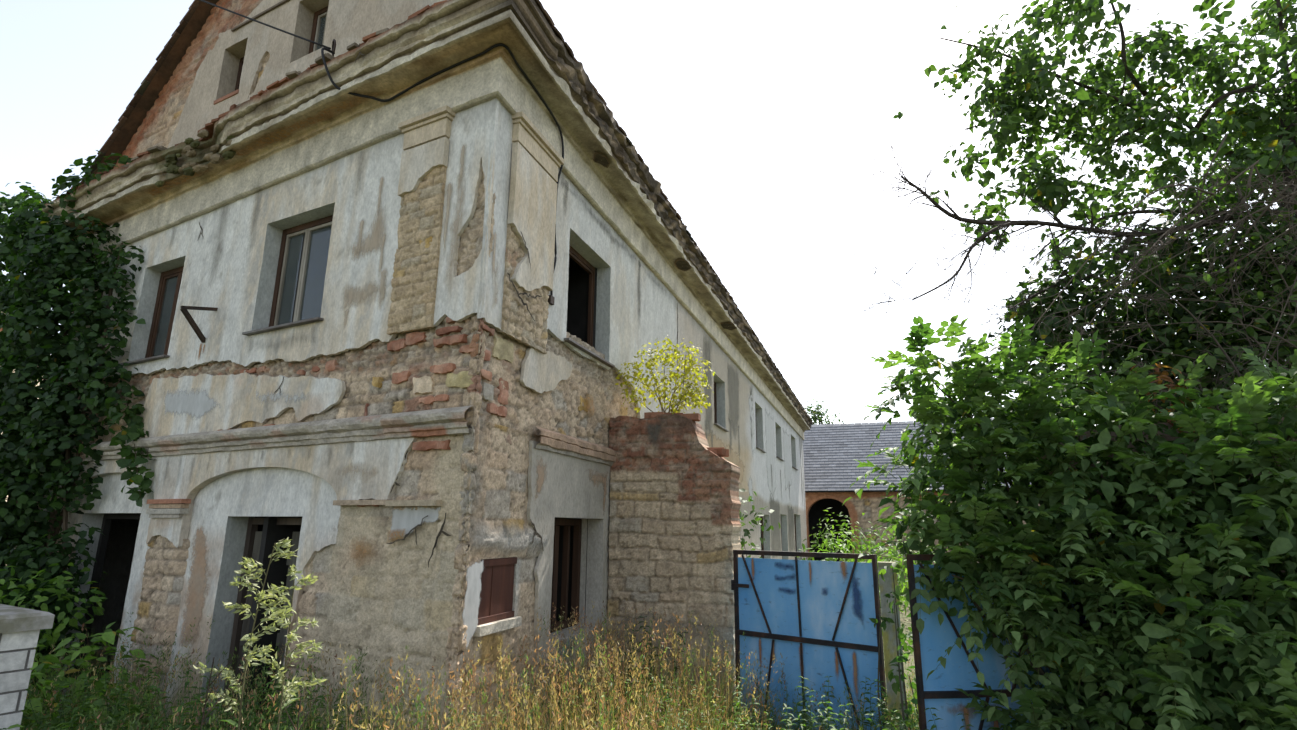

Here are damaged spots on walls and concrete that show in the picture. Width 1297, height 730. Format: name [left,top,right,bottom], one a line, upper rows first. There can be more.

spalling [114,0,263,187]
spalling [75,146,638,730]